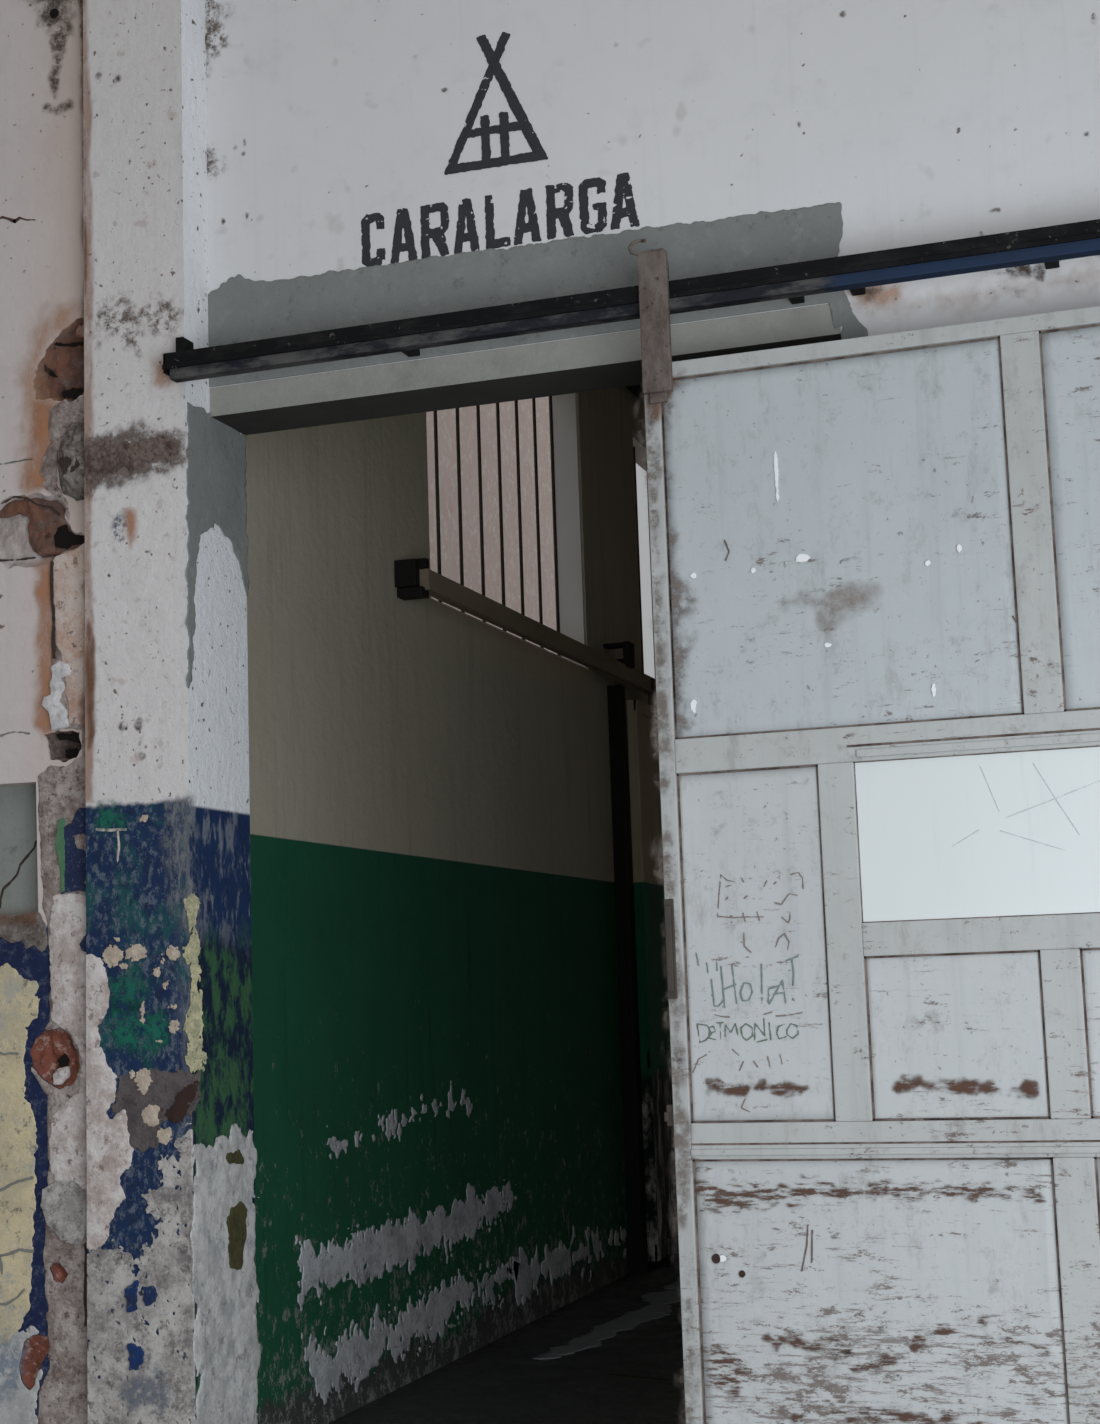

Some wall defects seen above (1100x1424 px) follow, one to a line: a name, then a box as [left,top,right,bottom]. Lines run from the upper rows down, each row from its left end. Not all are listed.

crack [0,841,37,908]
peeling [0,318,261,1424]
peeling [327,1080,473,1159]
peeling [295,1179,627,1405]